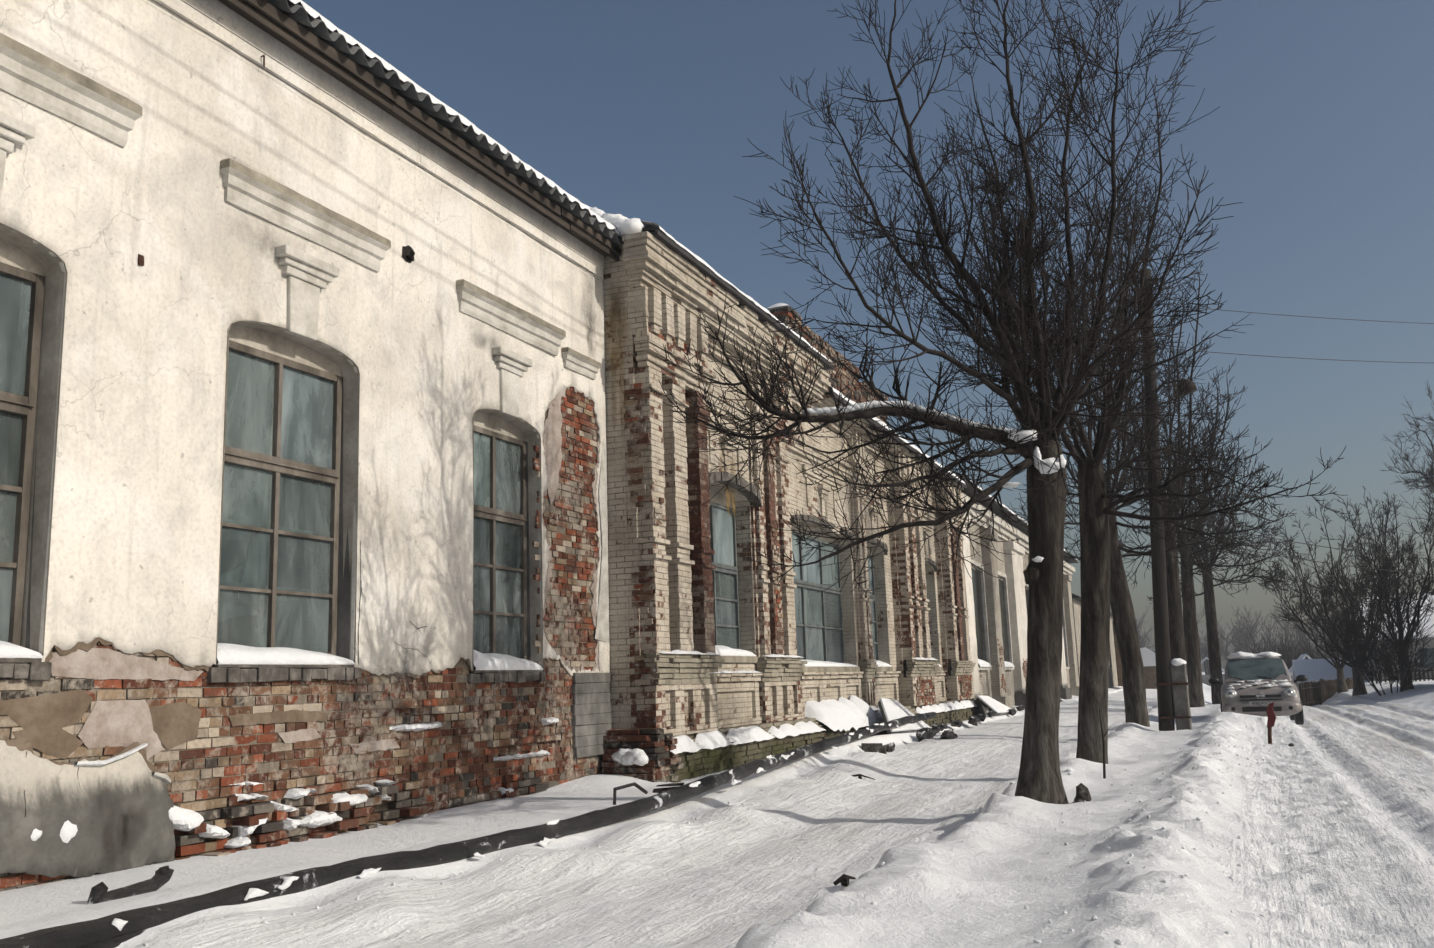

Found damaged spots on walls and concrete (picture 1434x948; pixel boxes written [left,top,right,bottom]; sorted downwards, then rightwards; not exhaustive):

peeling [648,322,705,364]
peeling [764,522,784,649]
spalling [0,380,684,860]
peeling [915,676,937,706]
peeling [958,675,973,701]
spalling [0,872,78,892]